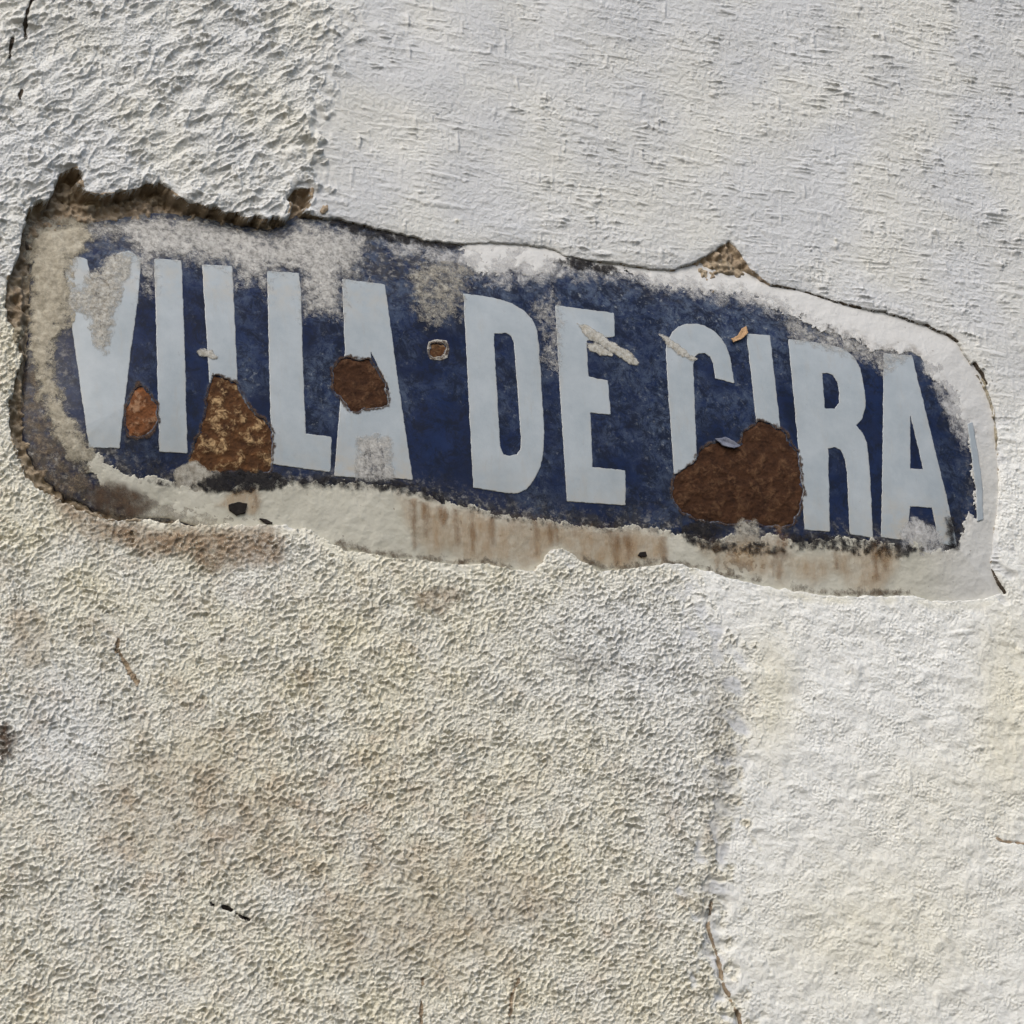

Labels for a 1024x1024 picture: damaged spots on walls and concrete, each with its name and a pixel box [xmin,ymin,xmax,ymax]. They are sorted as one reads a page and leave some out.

spalling [25,166,328,239]
spalling [665,243,770,286]
peeling [197,348,218,359]
peeling [577,323,639,365]
peeling [659,334,697,361]
peeling [731,327,748,342]
spalling [5,257,141,522]
spalling [978,375,998,449]
peeling [715,437,740,448]
crack [706,901,742,1024]